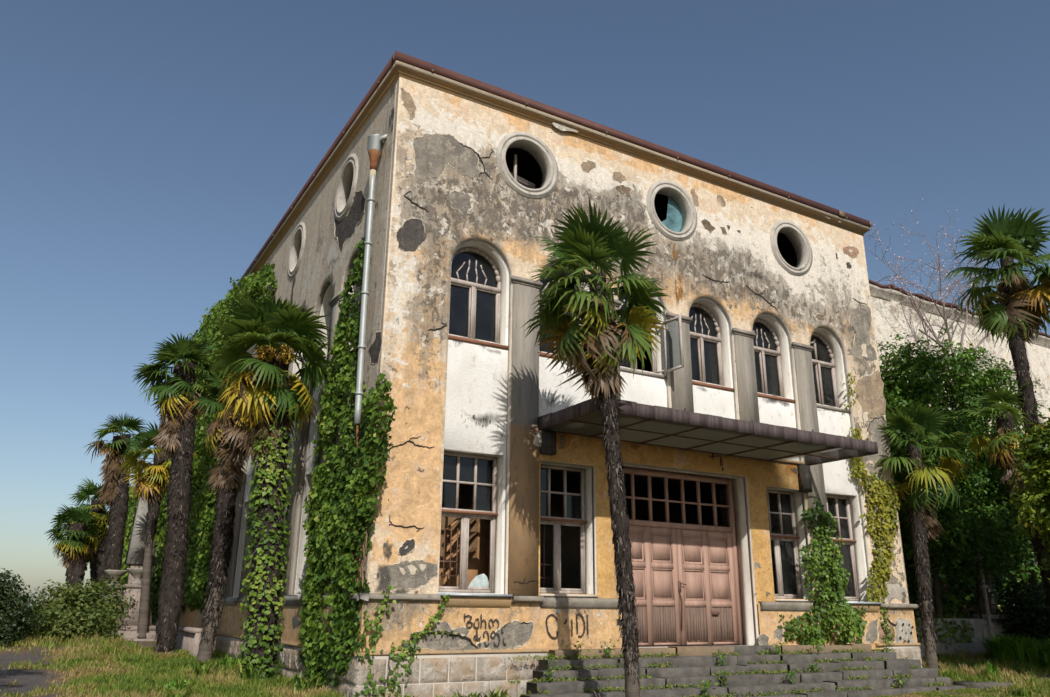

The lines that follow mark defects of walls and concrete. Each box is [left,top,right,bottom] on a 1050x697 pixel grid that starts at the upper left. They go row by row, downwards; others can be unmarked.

flaking render [412,133,480,213]
flaking render [581,160,596,173]
flaking render [612,171,632,196]
flaking render [334,191,366,252]
peeling [702,219,741,235]
peeling [836,246,859,269]
flaking render [368,331,381,365]
crack [392,436,432,448]
peeling [383,538,438,590]